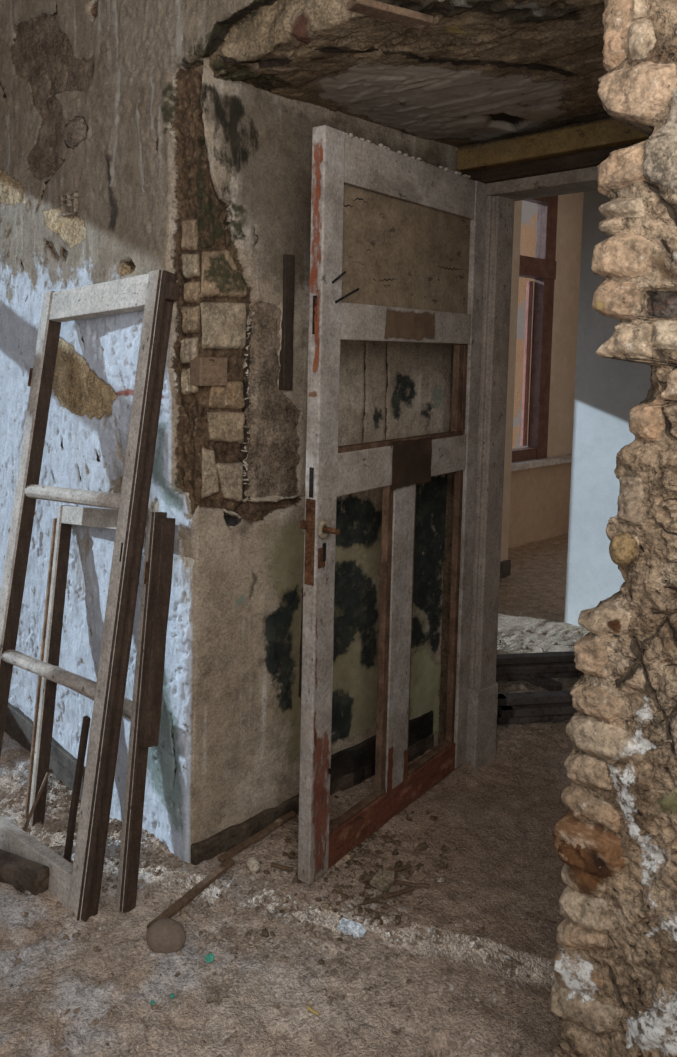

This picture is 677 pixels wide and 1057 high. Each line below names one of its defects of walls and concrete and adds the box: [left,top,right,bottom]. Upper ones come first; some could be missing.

flaking render [11,13,95,179]
damp [200,59,292,172]
peeling [318,63,567,141]
flaking render [591,0,677,359]
flaking render [162,61,301,527]
flaking render [52,338,134,418]
flaking render [629,368,677,442]
flaking render [612,475,645,556]
flaking render [561,600,637,837]
damp [608,696,669,906]
flaking render [549,864,624,1037]
damp [626,991,677,1054]